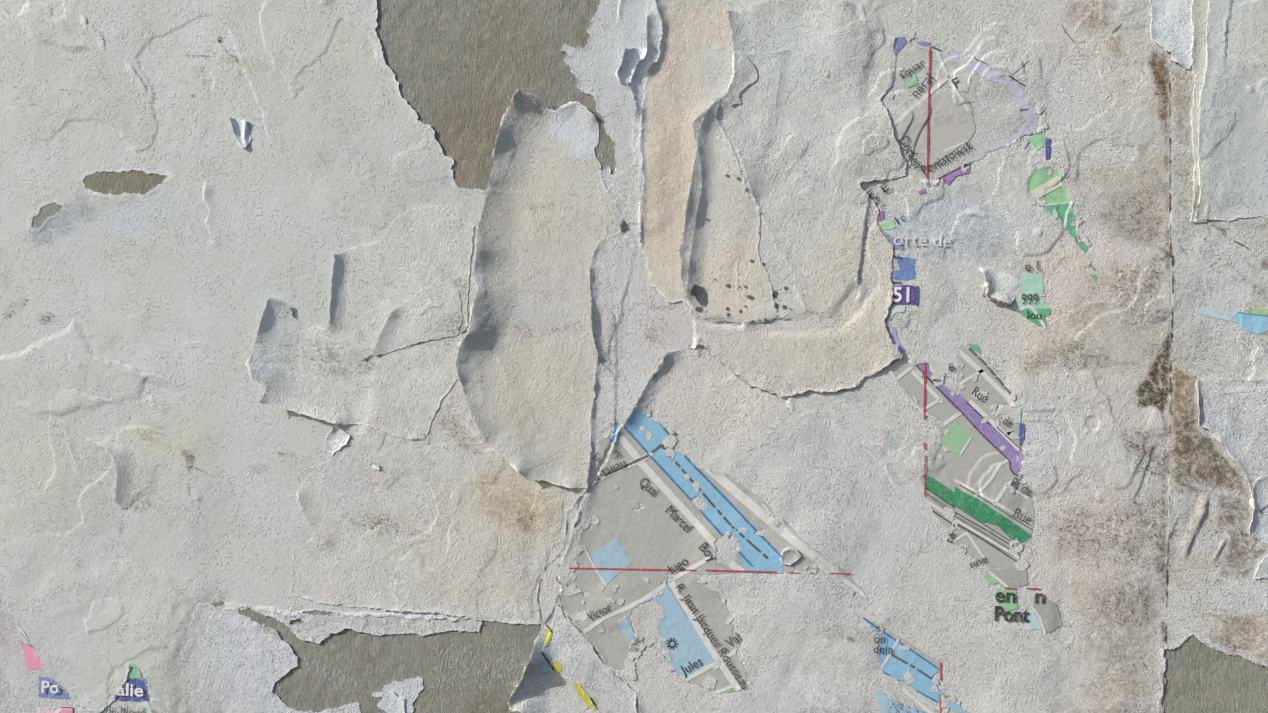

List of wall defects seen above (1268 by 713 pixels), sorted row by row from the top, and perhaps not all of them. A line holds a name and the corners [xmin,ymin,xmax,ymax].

peeling [32,202,63,228]
peeling [83,170,167,195]
peeling [245,0,628,488]
crack [1167,77,1175,434]
peeling [239,608,539,713]
crack [1140,543,1169,691]
peeling [1161,635,1268,713]